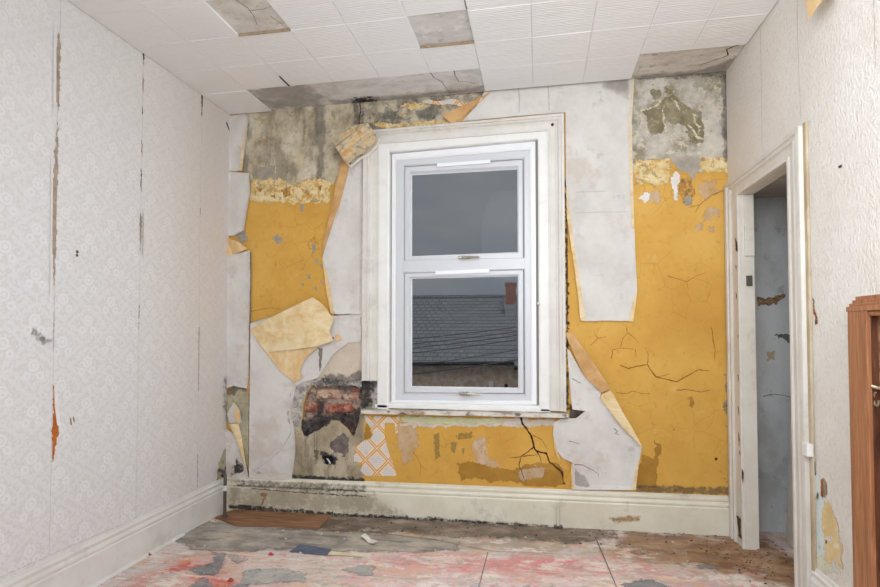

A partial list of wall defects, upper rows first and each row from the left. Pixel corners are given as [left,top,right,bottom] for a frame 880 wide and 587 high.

peeling [206,0,291,37]
peeling [408,10,474,49]
flaking render [631,44,745,233]
peeling [757,294,785,306]
flaking render [227,386,249,467]
spalling [251,275,377,480]
peeling [457,437,571,487]
crack [510,417,565,484]
spalling [569,404,585,418]
peeling [636,441,662,488]
crack [591,326,715,394]
peeling [815,459,843,575]